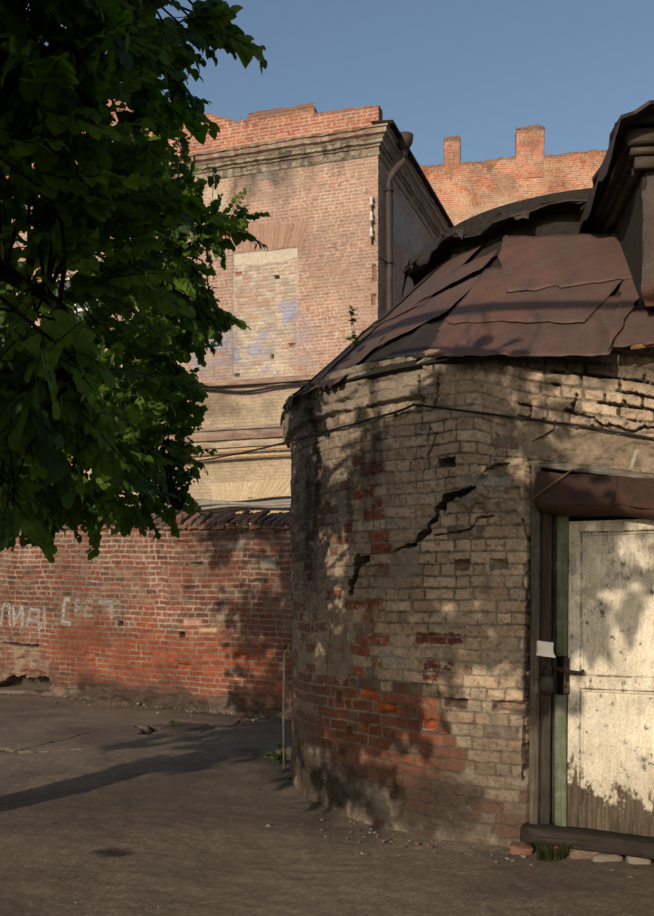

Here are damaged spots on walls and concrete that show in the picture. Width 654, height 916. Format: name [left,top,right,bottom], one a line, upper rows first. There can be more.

crack [517,360,654,442]
crack [391,462,510,554]
spalling [0,631,52,694]
crack [317,554,370,731]
damp [298,752,361,806]
peeling [579,770,654,816]